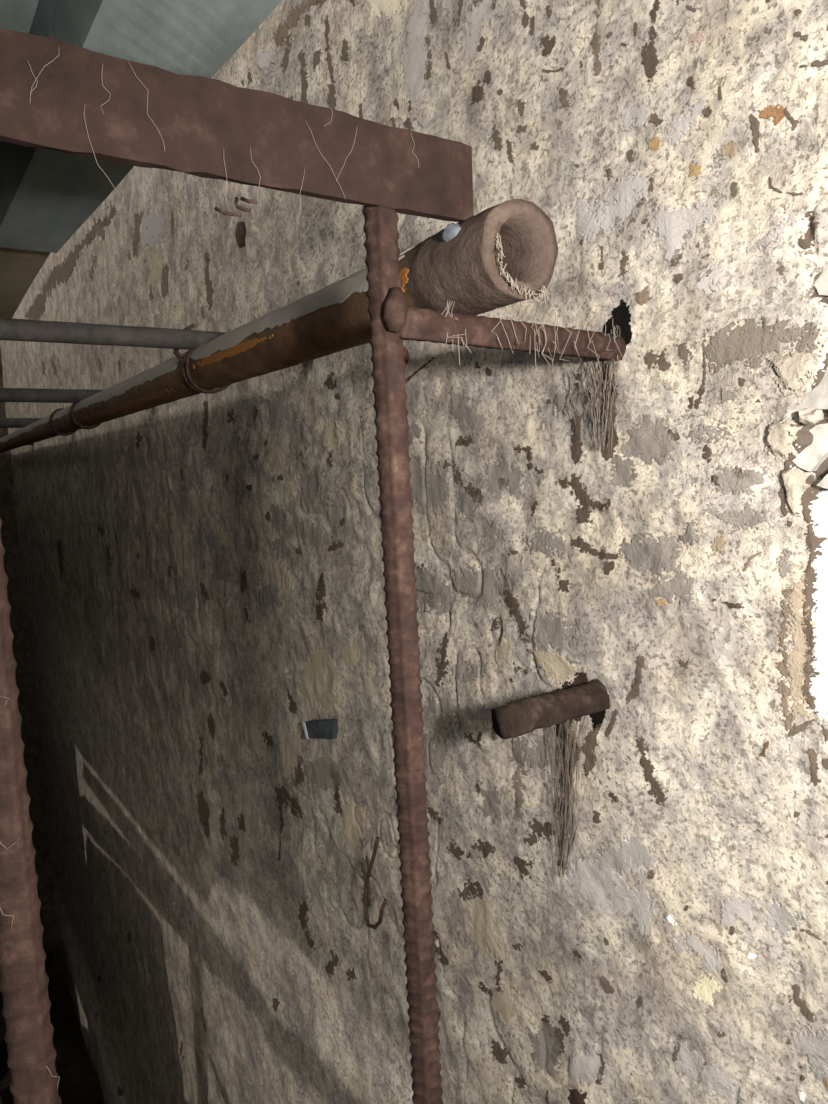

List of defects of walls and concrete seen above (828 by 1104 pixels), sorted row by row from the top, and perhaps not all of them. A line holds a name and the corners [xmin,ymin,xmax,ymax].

spalling [810,271,828,304]
spalling [811,352,828,391]
spalling [791,407,828,454]
flaking render [786,457,828,721]
corrosion [559,672,590,689]